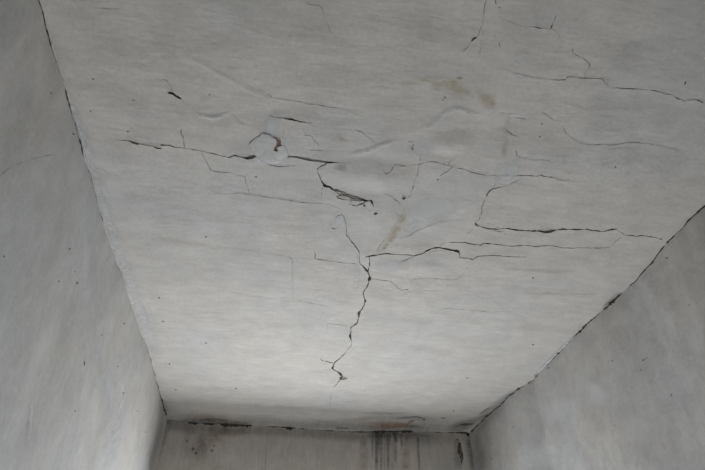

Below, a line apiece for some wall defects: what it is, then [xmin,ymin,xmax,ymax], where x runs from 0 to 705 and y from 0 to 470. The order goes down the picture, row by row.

crack [38,0,119,220]
crack [508,49,703,103]
crack [121,94,705,469]